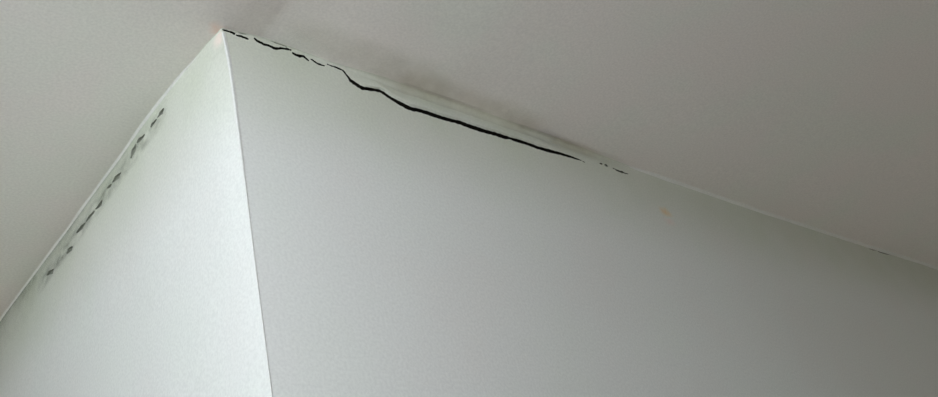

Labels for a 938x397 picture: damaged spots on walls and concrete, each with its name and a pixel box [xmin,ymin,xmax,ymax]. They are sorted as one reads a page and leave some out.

crack [222,29,628,174]